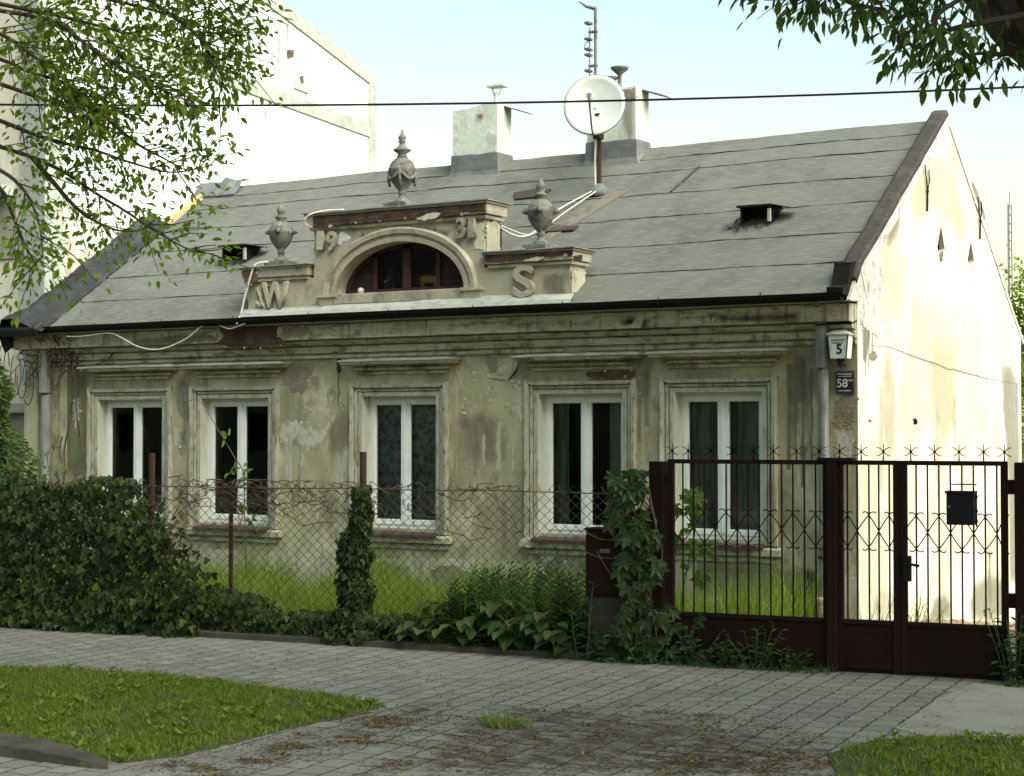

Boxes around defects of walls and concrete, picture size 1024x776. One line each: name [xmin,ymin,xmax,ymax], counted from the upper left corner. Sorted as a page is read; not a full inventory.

leakage [863,327,873,376]
spalling [584,368,645,395]
peeling [279,403,337,454]
leakage [478,421,514,472]
leakage [1003,369,1019,480]